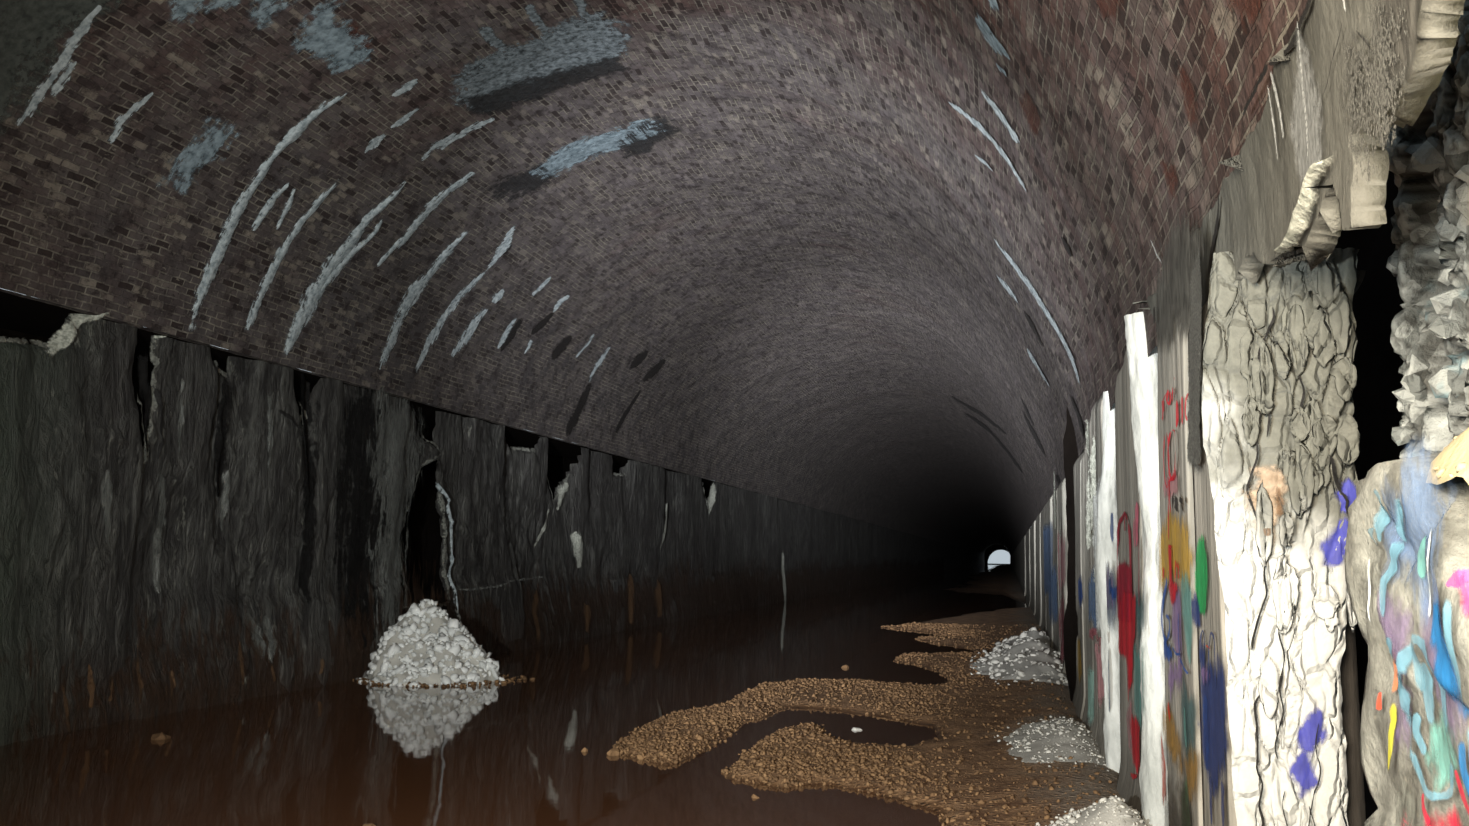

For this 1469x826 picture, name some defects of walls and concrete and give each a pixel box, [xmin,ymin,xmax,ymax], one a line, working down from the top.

leakage [189,93,346,331]
leakage [284,182,406,355]
leakage [379,231,468,369]
leakage [416,227,517,370]
leakage [421,0,631,161]
leakage [529,119,665,179]
leakage [949,88,1026,191]
leakage [994,239,1080,385]
spalling [1338,0,1469,459]
crack [1246,306,1349,517]
crack [453,576,543,591]
crack [1251,557,1321,826]